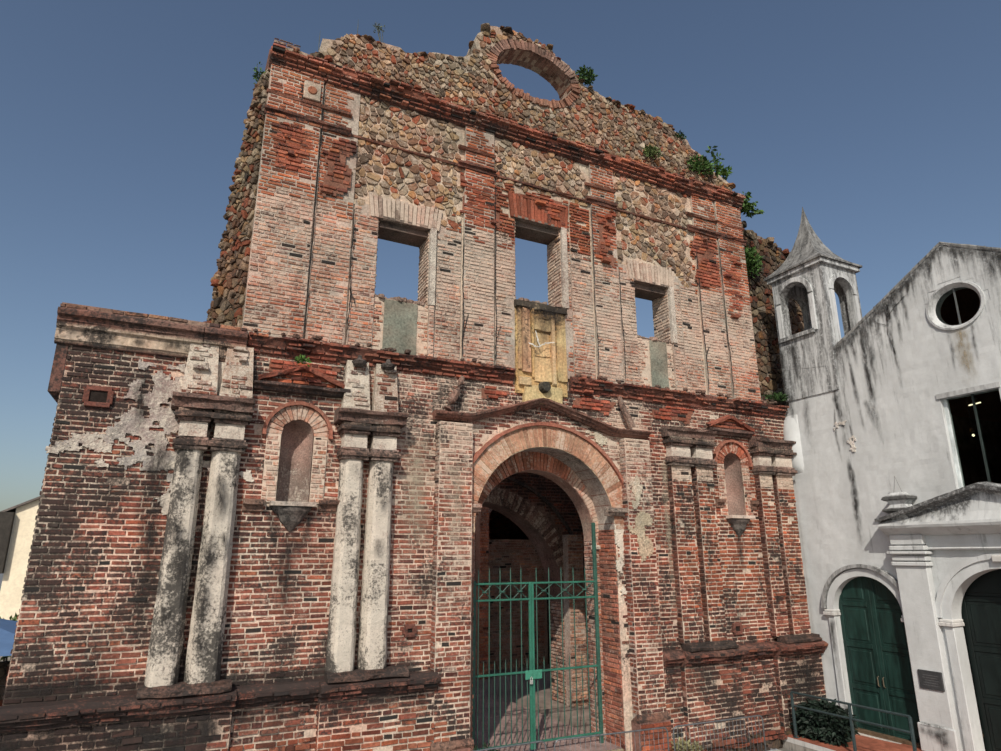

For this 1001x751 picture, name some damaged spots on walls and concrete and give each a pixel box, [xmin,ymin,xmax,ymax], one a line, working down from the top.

flaking render [217,361,225,396]
damp [839,273,915,396]
flaking render [45,359,186,515]
damp [142,449,166,557]
flaking render [239,470,254,482]
flaking render [585,430,608,447]
flaking render [612,471,654,573]
damp [848,464,858,518]